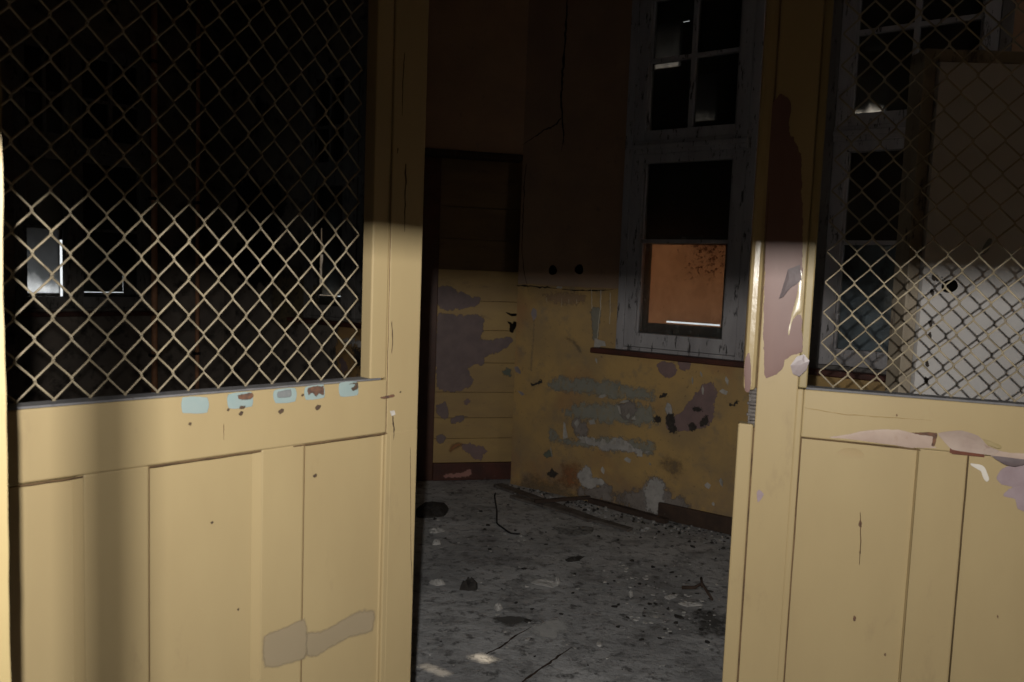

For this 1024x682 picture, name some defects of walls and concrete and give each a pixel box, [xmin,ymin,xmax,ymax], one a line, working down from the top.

peeling [763,94,809,378]
peeling [436,285,513,478]
peeling [517,361,729,515]
peeling [830,429,1024,511]